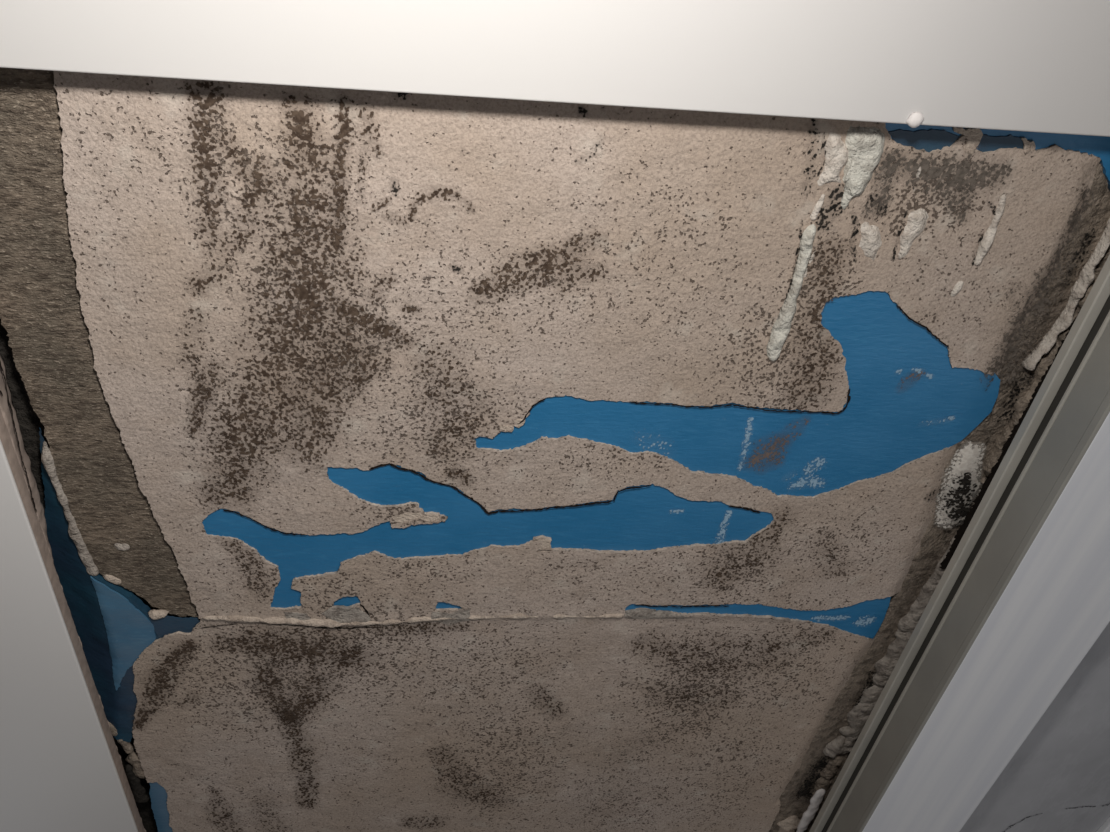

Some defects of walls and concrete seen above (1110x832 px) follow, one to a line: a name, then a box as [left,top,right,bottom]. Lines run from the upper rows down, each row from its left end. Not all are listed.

leakage [177,81,494,513]
leakage [467,232,609,304]
leakage [801,119,819,195]
leakage [861,148,1013,225]
peeling [885,123,1110,191]
spalling [0,68,200,832]
peeling [202,463,774,626]
peeling [474,291,1000,497]
leakage [694,508,797,590]
peeling [624,597,891,639]
leakage [769,162,1110,832]
leakage [132,624,378,809]